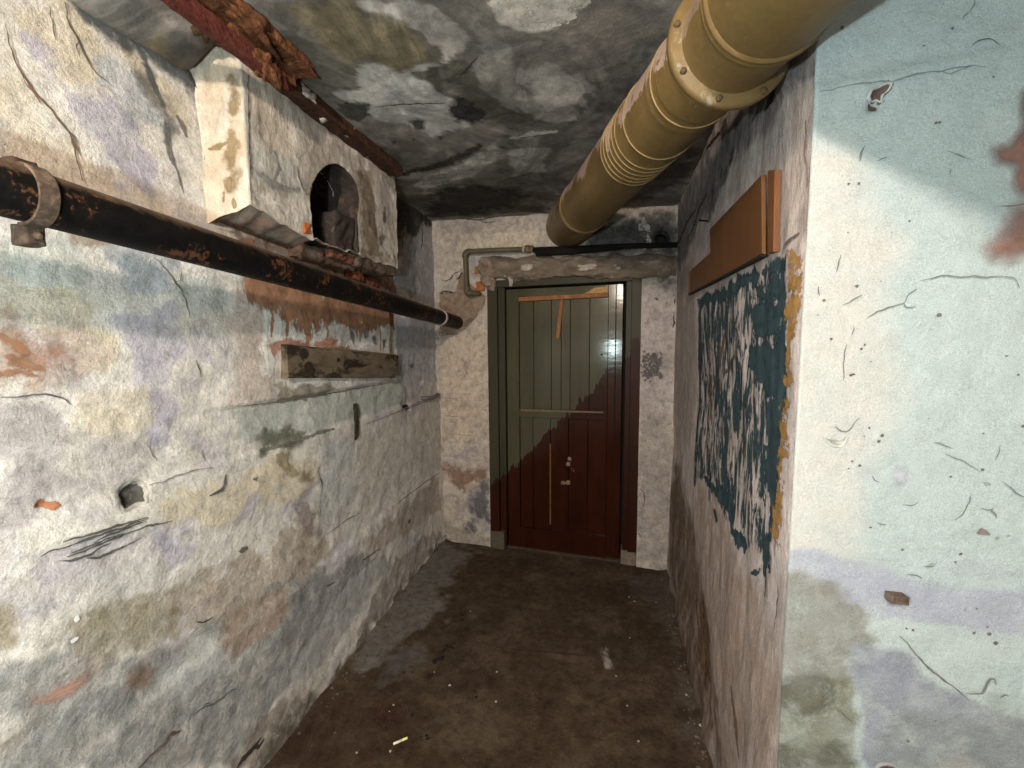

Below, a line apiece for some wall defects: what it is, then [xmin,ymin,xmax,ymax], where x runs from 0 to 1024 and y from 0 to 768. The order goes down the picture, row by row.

rust [219,0,286,92]
crack [5,24,83,180]
leakage [338,102,370,121]
leakage [448,97,485,123]
spalling [867,82,894,111]
leakage [358,171,386,256]
rust [237,276,394,356]
spalling [437,266,487,338]
crack [843,275,1020,380]
peeling [694,249,803,597]
hole [116,479,150,512]
crack [900,636,1008,702]